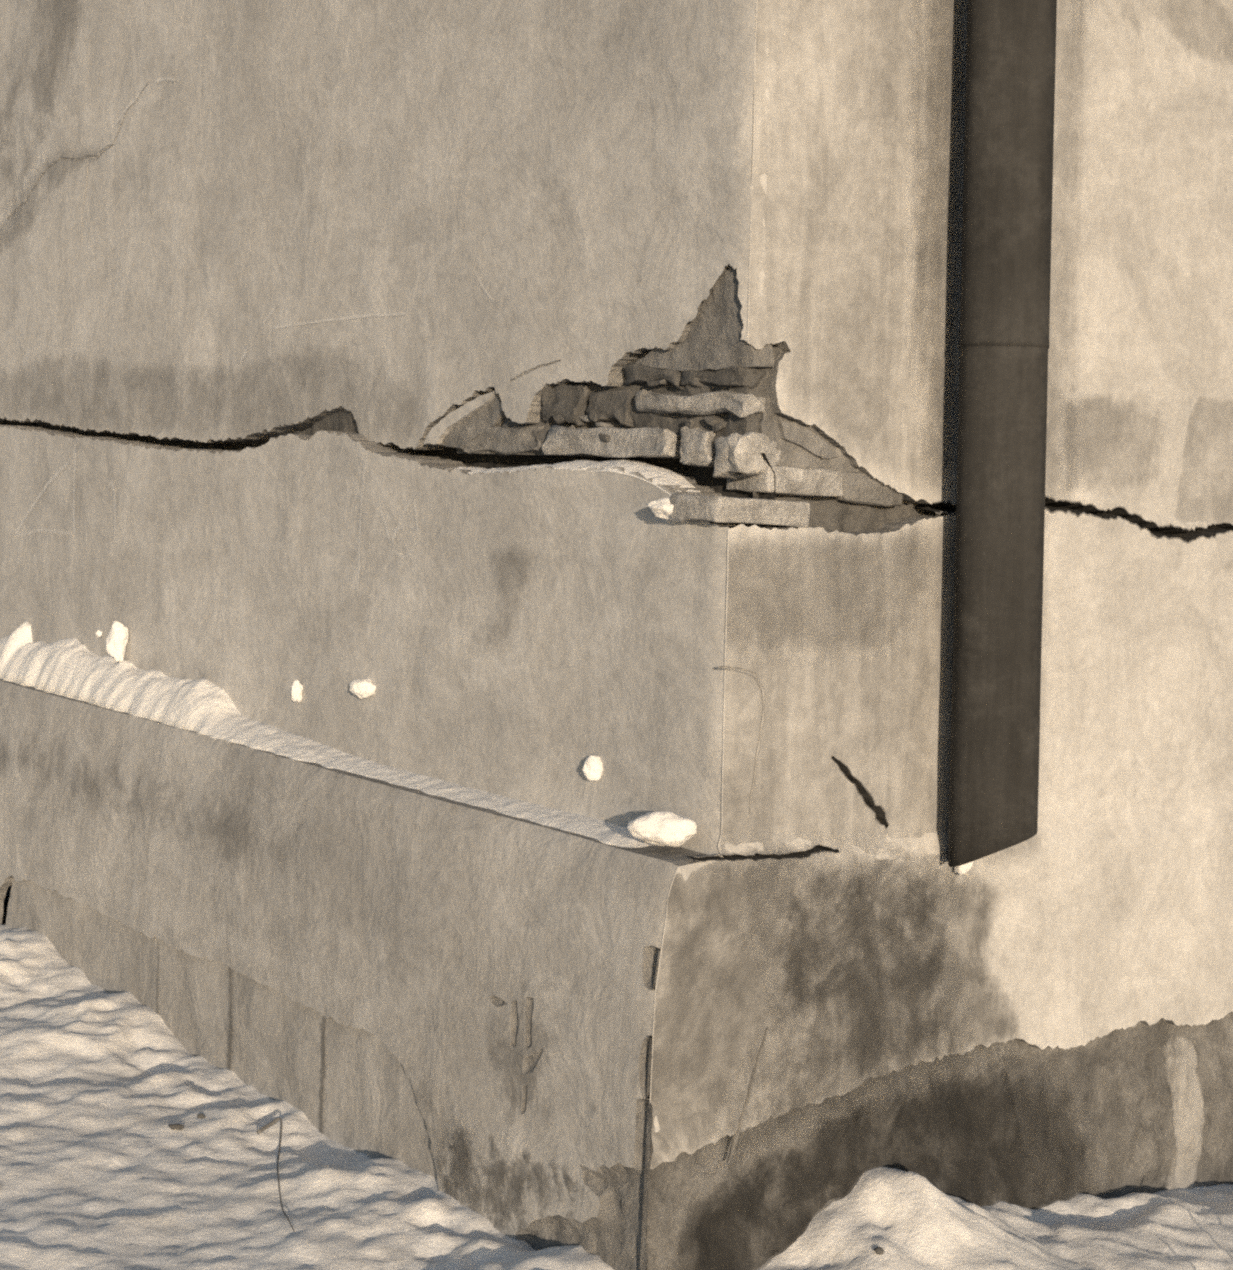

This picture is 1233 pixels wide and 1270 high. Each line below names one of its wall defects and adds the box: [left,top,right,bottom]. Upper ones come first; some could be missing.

crack [7,82,149,242]
crack [0,409,359,451]
flaking render [423,264,929,532]
crack [409,446,775,529]
crack [914,500,956,516]
crack [1045,495,1233,544]
crack [718,666,765,814]
crack [831,755,889,828]
crack [687,844,840,862]
leakage [672,859,1088,1270]